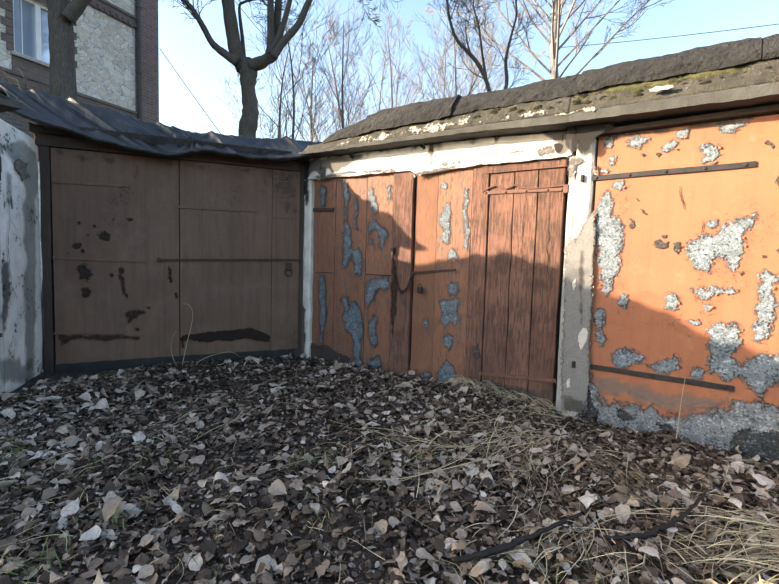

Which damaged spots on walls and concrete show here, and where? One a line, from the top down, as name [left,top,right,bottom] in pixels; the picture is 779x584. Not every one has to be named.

spalling [536,142,563,157]
spalling [567,135,617,179]
peeling [625,134,651,157]
peeling [656,127,690,157]
peeling [698,120,749,165]
peeling [438,187,471,262]
corrosion [76,263,94,298]
peeling [314,168,395,370]
corrosion [58,306,151,344]
corrosion [181,328,270,348]
peeling [420,280,461,383]
peeling [559,179,779,461]